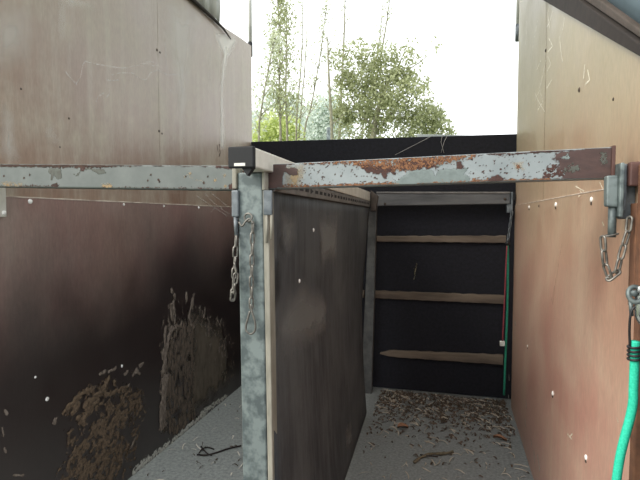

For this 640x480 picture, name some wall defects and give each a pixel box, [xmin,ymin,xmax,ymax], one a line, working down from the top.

rust [280,150,574,188]